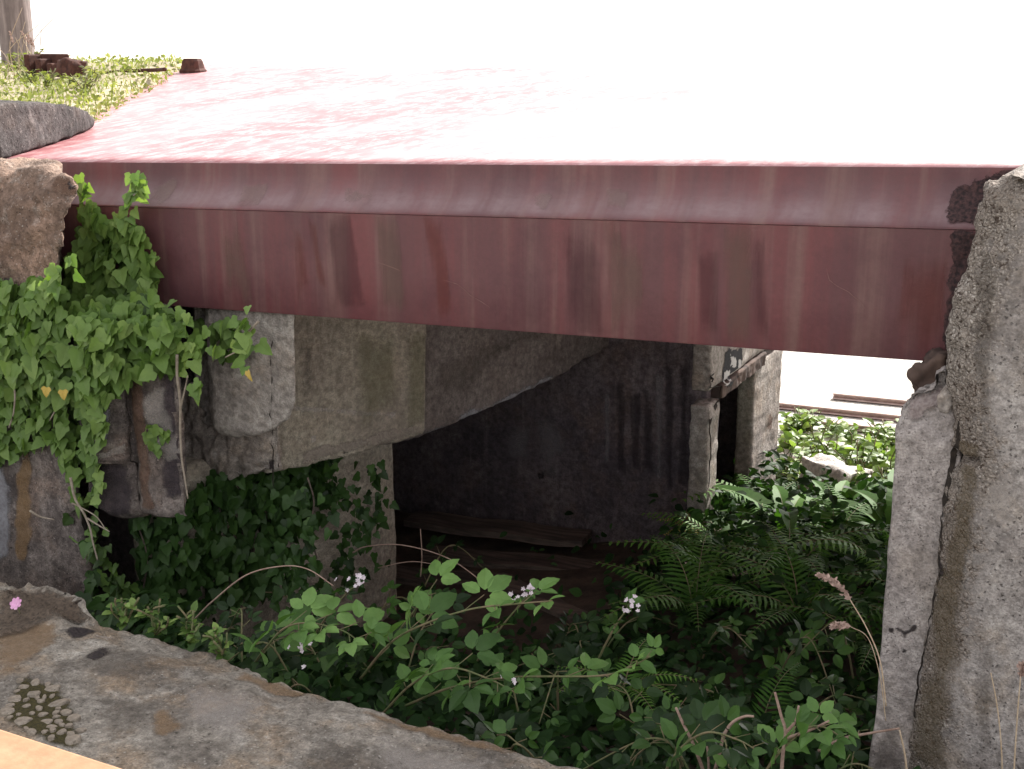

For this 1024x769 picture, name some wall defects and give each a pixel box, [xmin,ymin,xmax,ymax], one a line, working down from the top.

peeling [942,170,1012,351]
crack [914,421,963,717]